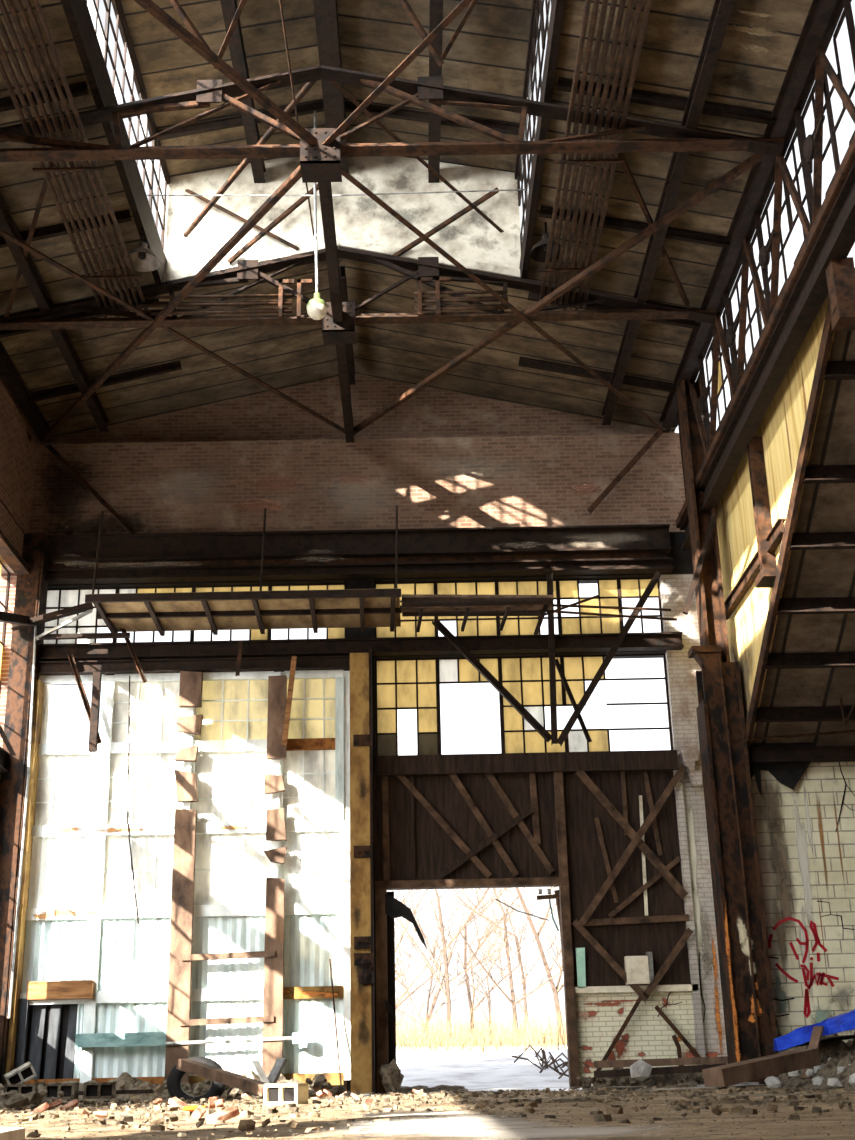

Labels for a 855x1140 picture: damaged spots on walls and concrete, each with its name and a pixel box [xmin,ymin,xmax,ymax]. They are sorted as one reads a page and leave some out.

damp [755,783,812,1013]
peeling [584,1000,648,1017]
peeling [580,1045,594,1073]
peeling [608,1034,646,1060]